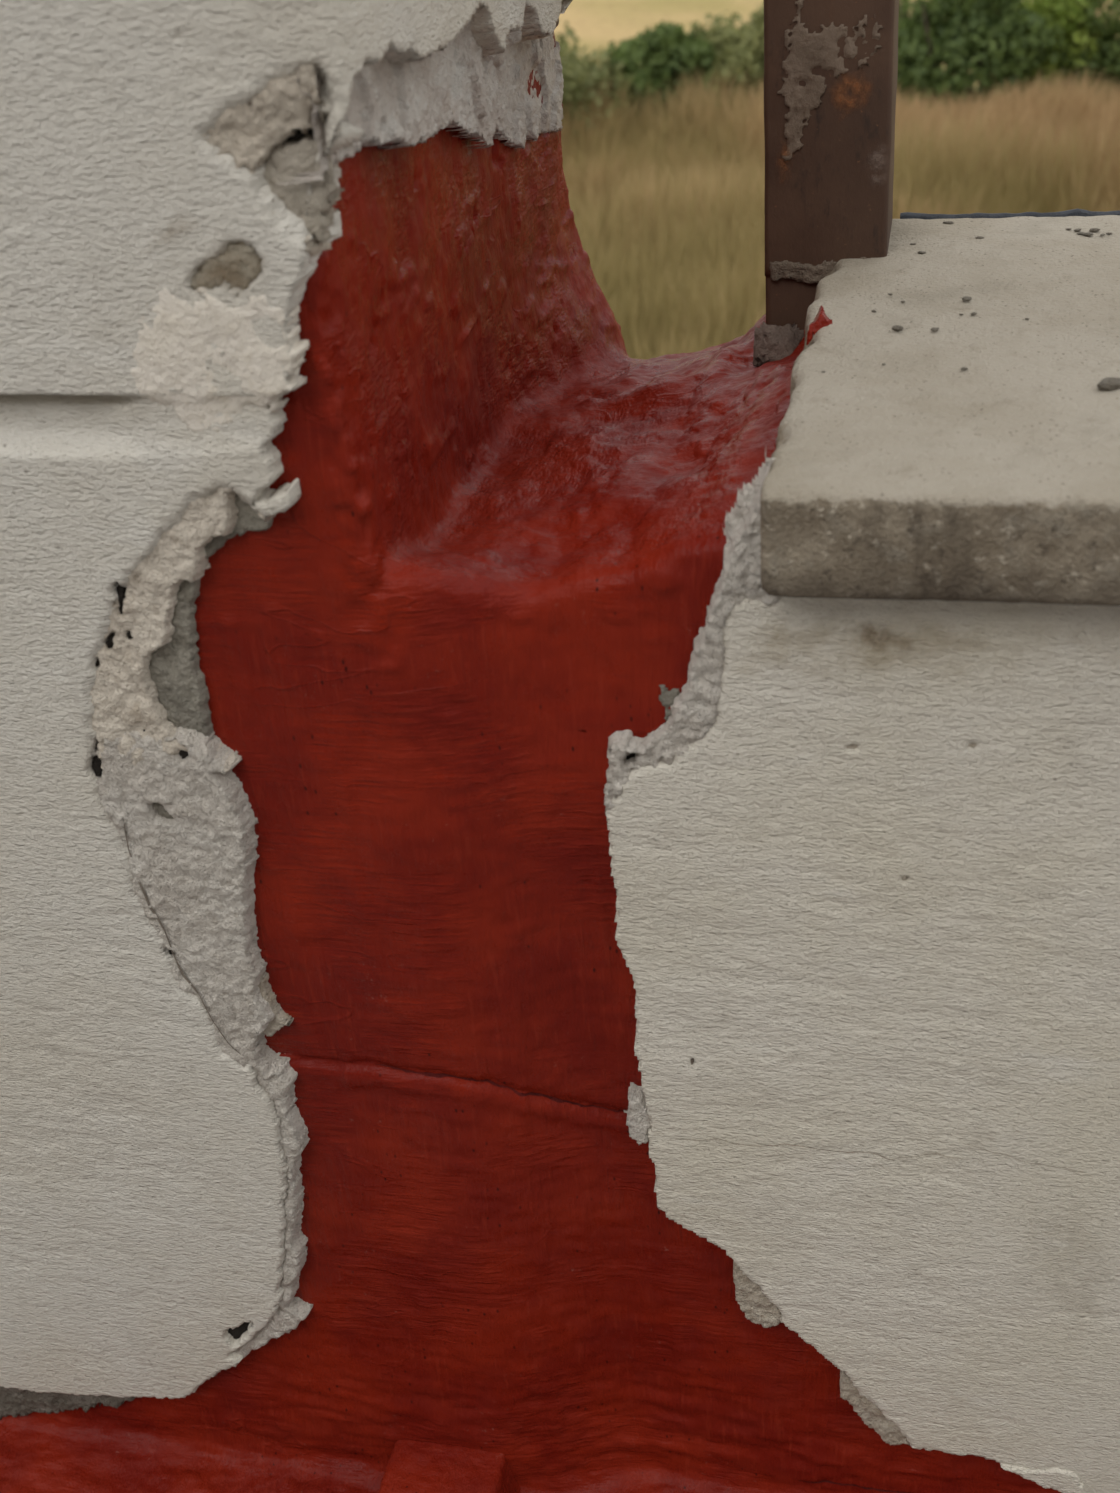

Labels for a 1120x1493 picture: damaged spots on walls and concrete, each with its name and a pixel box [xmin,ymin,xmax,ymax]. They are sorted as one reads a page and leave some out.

peeling [777,0,883,165]
flaking render [202,20,564,256]
spalling [190,241,263,296]
peeling [806,305,832,346]
spalling [604,448,781,813]
spalling [89,488,313,1357]
crack [376,1064,624,1112]
spalling [624,1082,650,1145]
crack [675,1138,1119,1178]
spalling [733,1260,781,1328]
spalling [840,1371,910,1446]